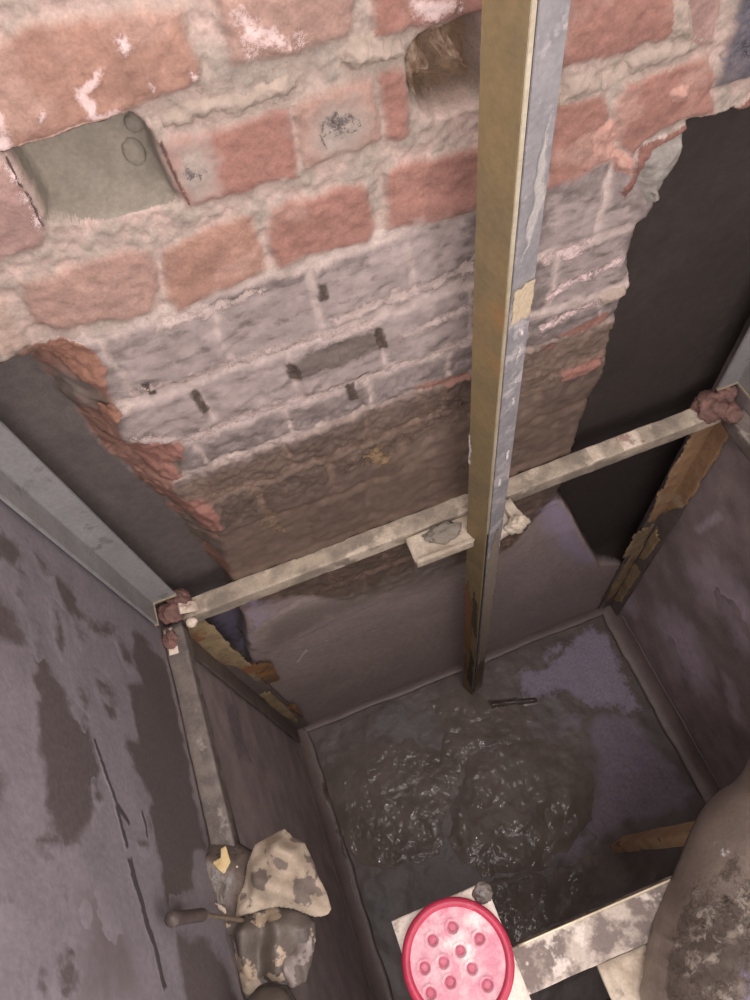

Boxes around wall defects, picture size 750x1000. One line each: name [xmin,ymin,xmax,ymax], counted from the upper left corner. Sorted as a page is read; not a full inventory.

leakage [67,64,124,122]
leakage [212,0,305,62]
spalling [405,15,473,100]
spalling [13,111,178,224]
spalling [620,120,687,200]
spalling [29,335,123,423]
spalling [124,441,228,533]
rust [606,421,730,602]
rust [185,620,304,724]
leakage [0,520,208,1000]
crack [93,738,168,994]
leakage [172,923,239,1000]